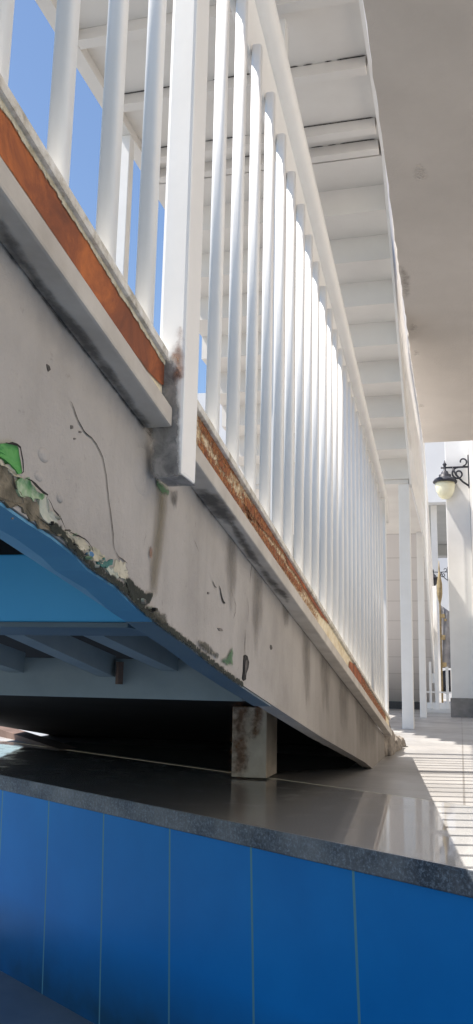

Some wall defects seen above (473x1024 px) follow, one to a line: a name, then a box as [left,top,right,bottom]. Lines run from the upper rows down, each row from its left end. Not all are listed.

corrosion [0,97,182,385]
crack [71,402,129,573]
peeling [0,442,244,686]
corrosion [196,417,329,624]
corrosion [233,705,262,771]
corrosion [349,662,386,721]